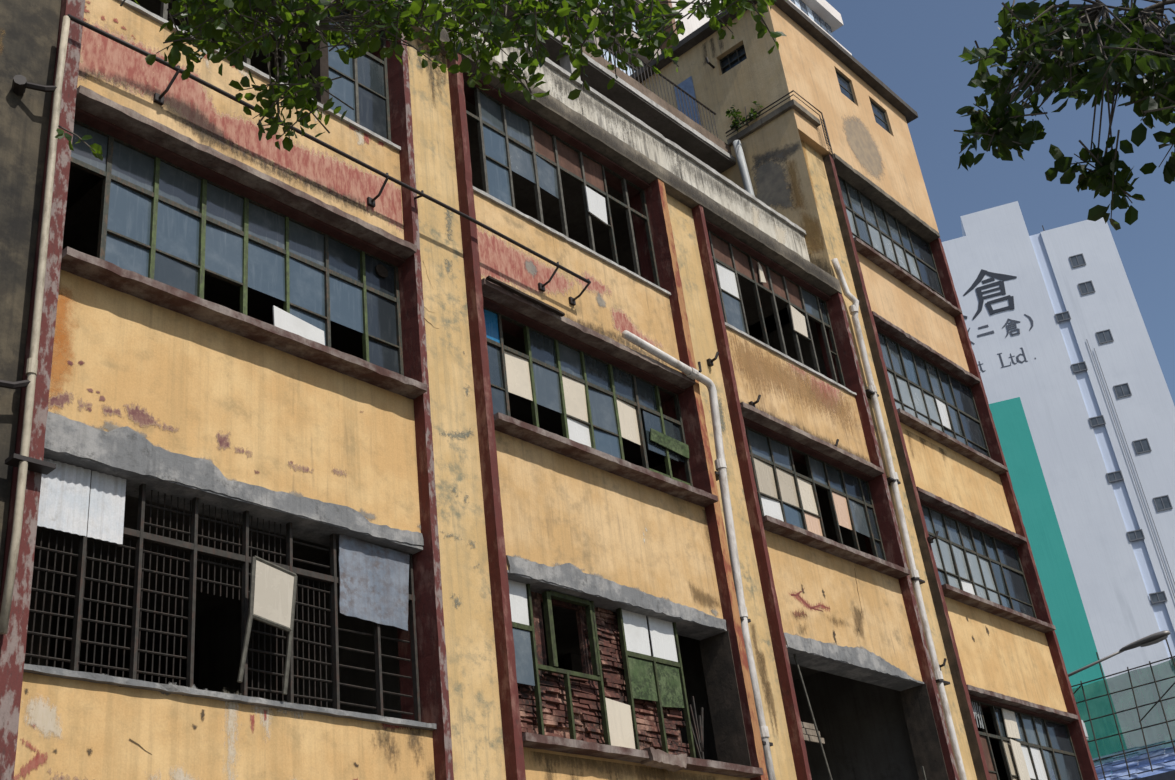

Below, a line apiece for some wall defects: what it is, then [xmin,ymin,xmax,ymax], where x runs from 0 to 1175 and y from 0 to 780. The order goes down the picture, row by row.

peeling [48,389,178,432]
peeling [216,432,252,458]